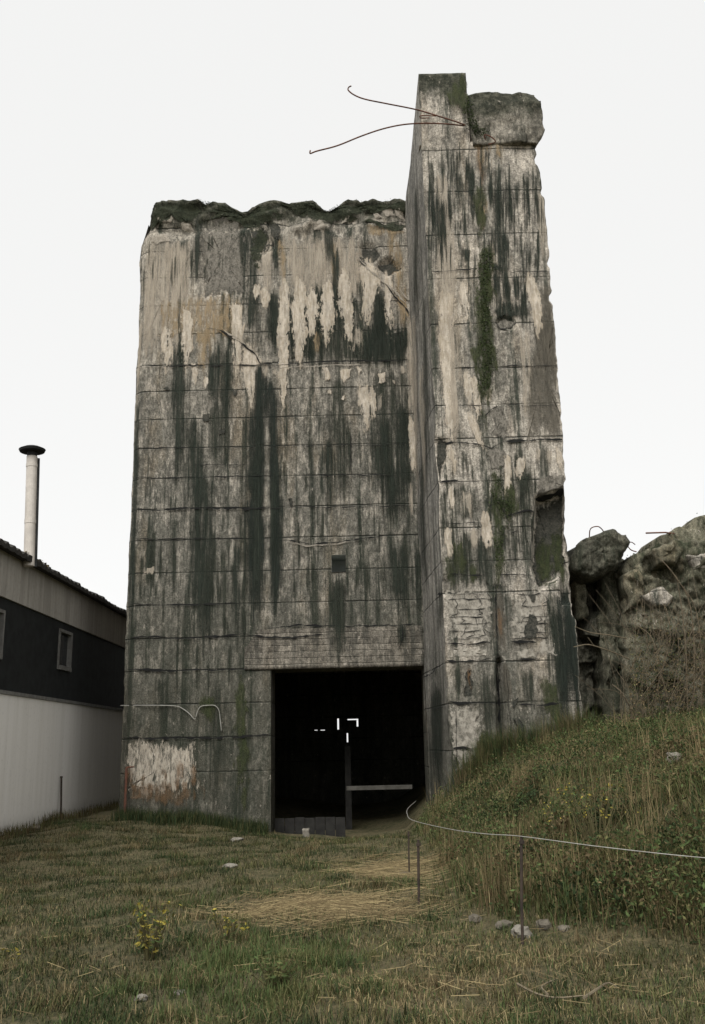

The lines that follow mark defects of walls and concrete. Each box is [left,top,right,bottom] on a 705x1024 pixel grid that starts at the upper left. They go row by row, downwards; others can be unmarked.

spalling [151,201,406,298]
damp [129,143,563,810]
spalling [510,496,565,658]
crack [423,573,559,773]
peeling [125,738,199,797]